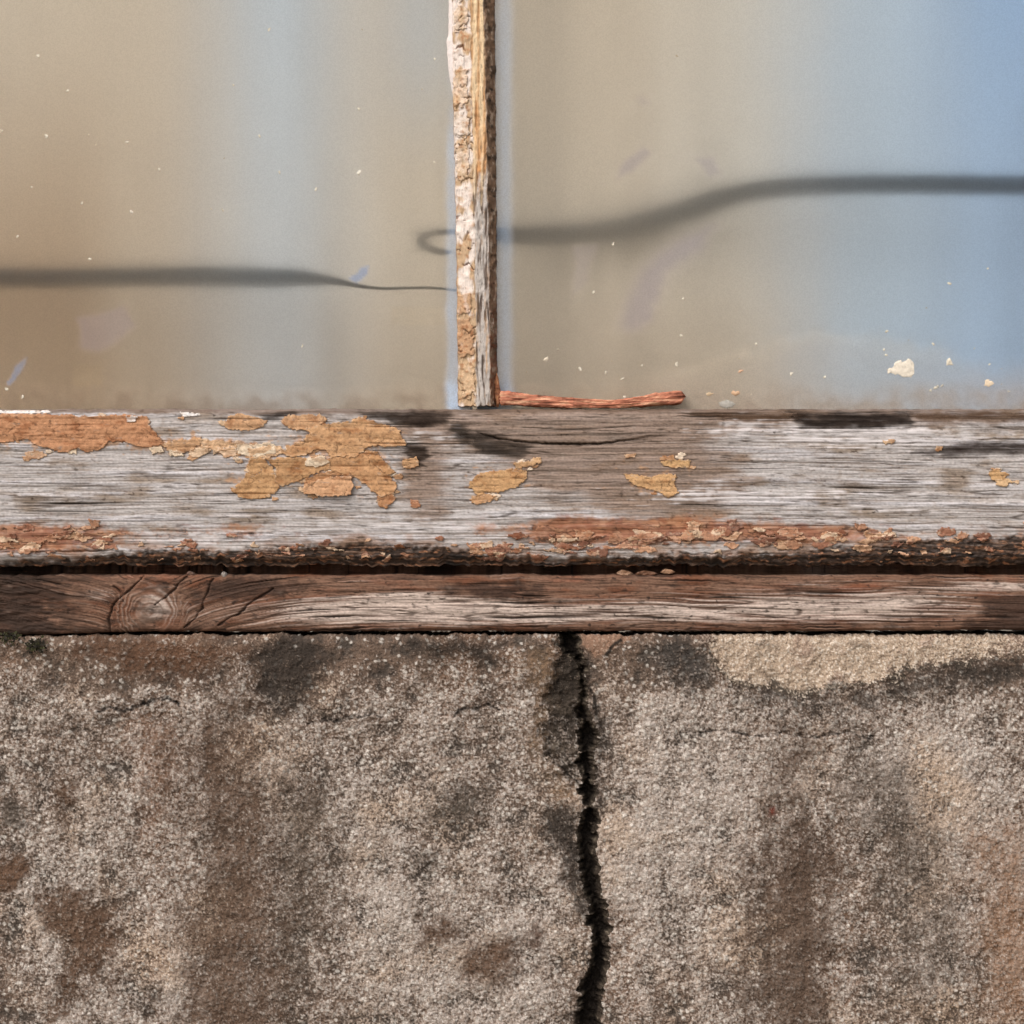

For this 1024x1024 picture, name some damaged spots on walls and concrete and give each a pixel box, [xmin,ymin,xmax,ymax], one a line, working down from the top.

peeling [0,410,419,509]
peeling [469,457,542,505]
peeling [624,452,696,498]
peeling [989,468,1019,487]
peeling [0,519,118,561]
peeling [157,538,207,562]
peeling [231,538,405,562]
peeling [435,519,994,563]
crack [543,633,614,1024]